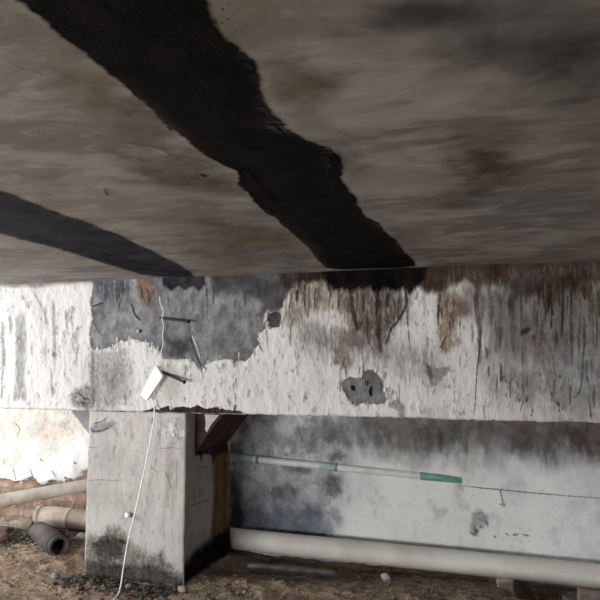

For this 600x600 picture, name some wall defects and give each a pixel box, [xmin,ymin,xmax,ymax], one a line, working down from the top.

damp [0,0,426,295]
peeling [89,273,293,370]
damp [304,326,435,386]
peeling [342,368,404,418]
damp [466,282,600,421]
peeling [0,492,87,520]
peeling [0,468,88,494]
damp [85,415,347,585]